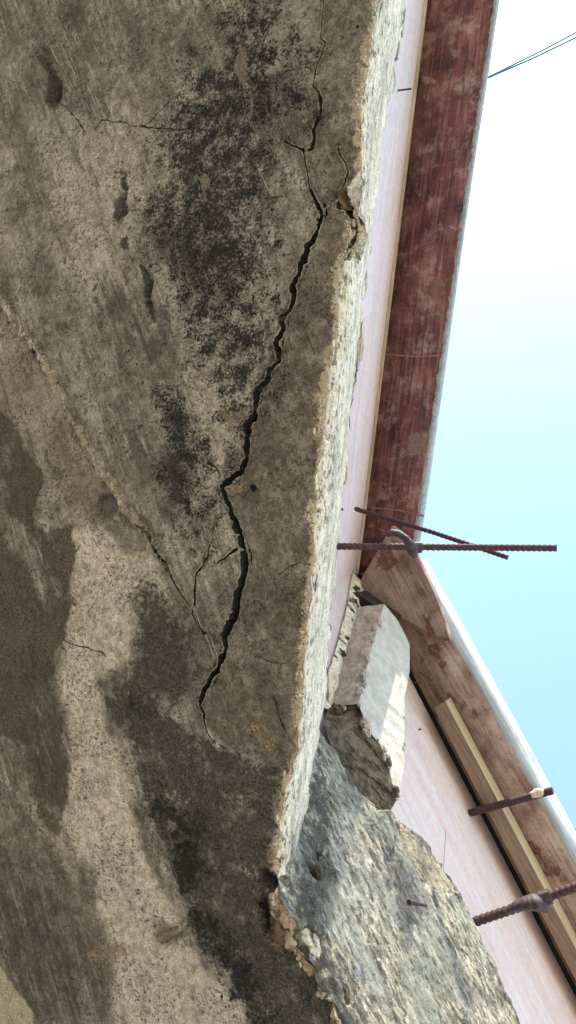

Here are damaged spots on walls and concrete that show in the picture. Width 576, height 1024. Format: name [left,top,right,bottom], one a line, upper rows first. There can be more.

crack [60,102,232,137]
water stain [101,579,336,1024]
water stain [130,0,336,567]
crack [133,0,361,770]
spalling [256,76,366,976]
spalling [316,991,341,1024]